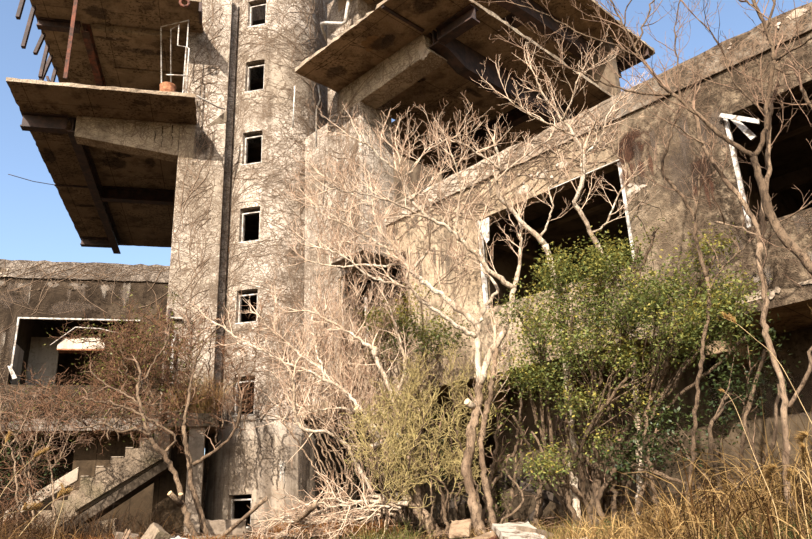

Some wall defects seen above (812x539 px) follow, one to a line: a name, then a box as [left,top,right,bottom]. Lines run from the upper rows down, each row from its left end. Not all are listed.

corrosion [615,129,653,188]